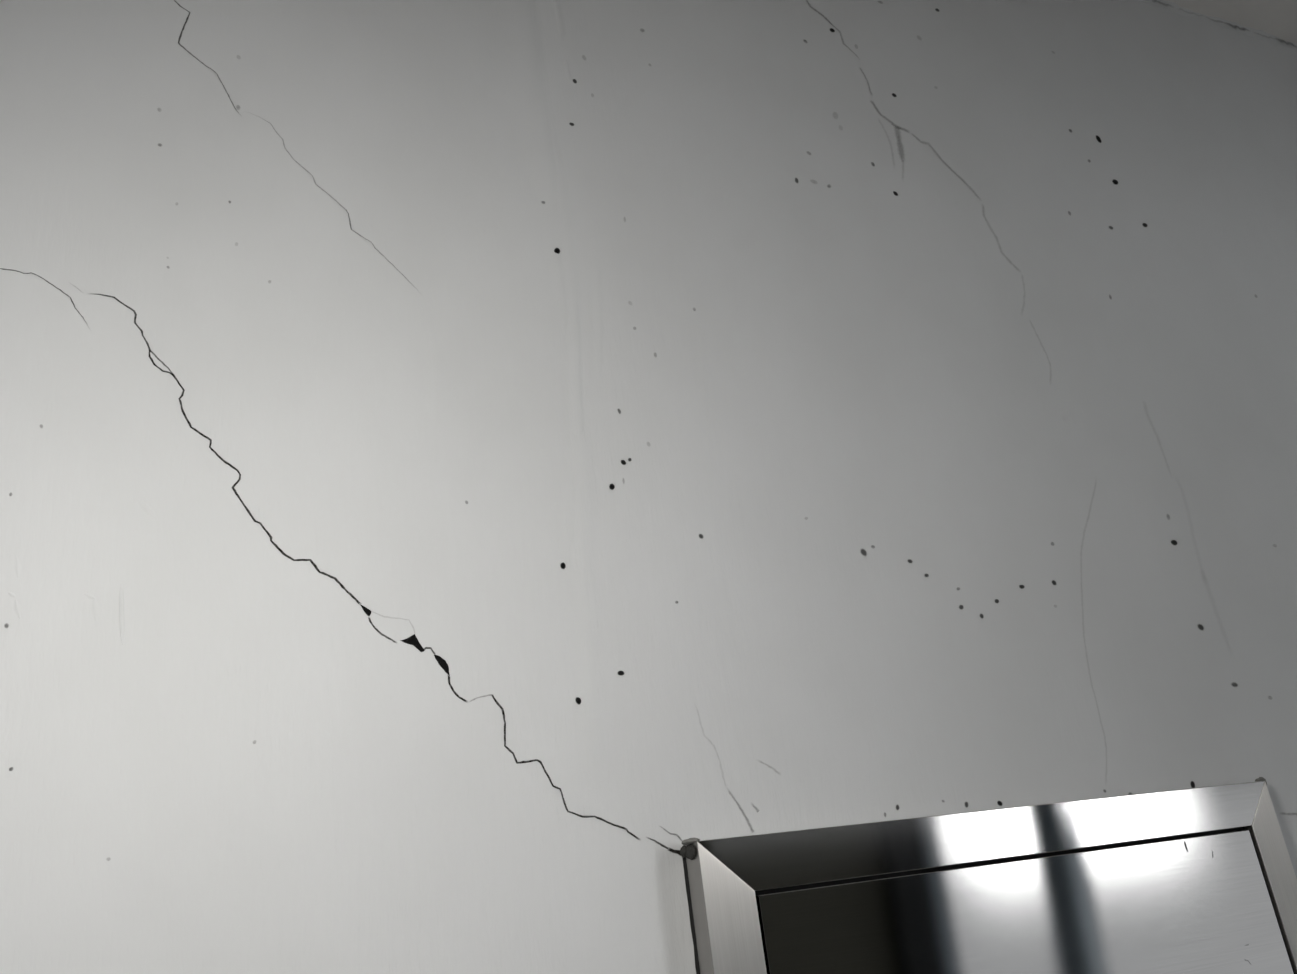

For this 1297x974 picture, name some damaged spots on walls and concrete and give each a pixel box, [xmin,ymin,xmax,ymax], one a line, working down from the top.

crack [174,0,236,110]
crack [0,268,681,856]